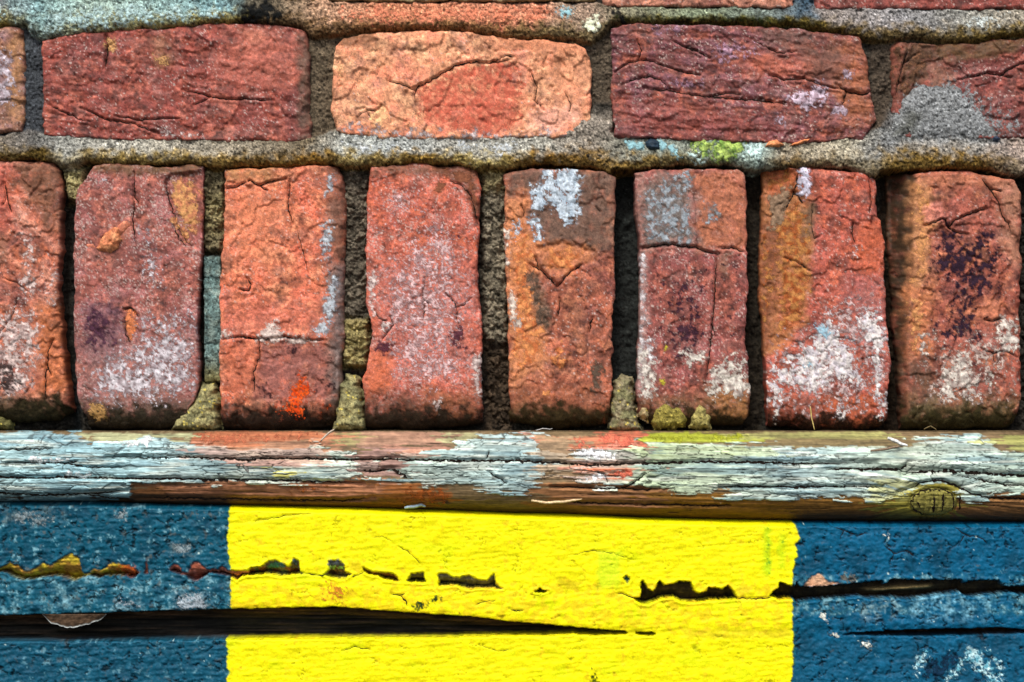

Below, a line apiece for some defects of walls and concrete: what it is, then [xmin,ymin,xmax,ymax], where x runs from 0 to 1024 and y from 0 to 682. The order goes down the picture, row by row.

crack [389,55,541,106]
crack [50,91,273,132]
crack [928,179,1011,235]
water stain [637,253,660,425]
crack [642,244,744,384]
water stain [766,280,1020,431]
water stain [672,348,751,429]
peeling [0,554,148,581]
peeling [170,544,302,611]
peeling [438,573,500,589]
peeling [624,576,737,604]
peeling [770,573,1024,602]